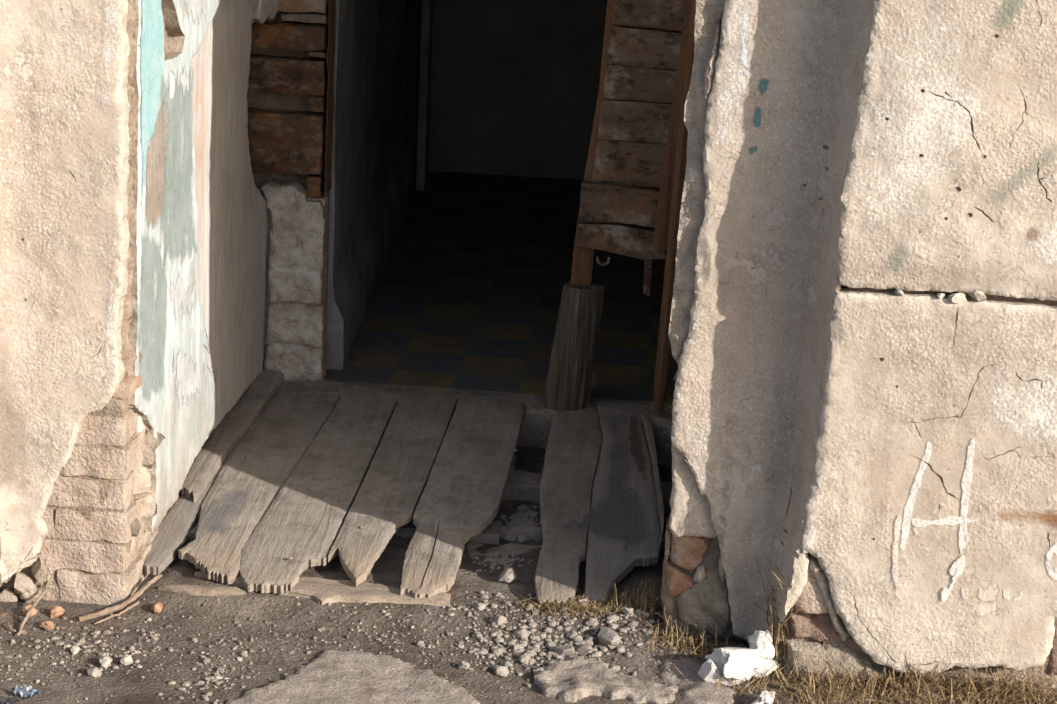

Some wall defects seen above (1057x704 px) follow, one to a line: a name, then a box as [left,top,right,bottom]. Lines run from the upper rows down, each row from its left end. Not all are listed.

crack [925,89,984,157]
crack [1009,84,1028,147]
spalling [0,0,200,606]
crack [903,364,1042,510]
spalling [661,444,737,639]
spalling [773,553,890,677]